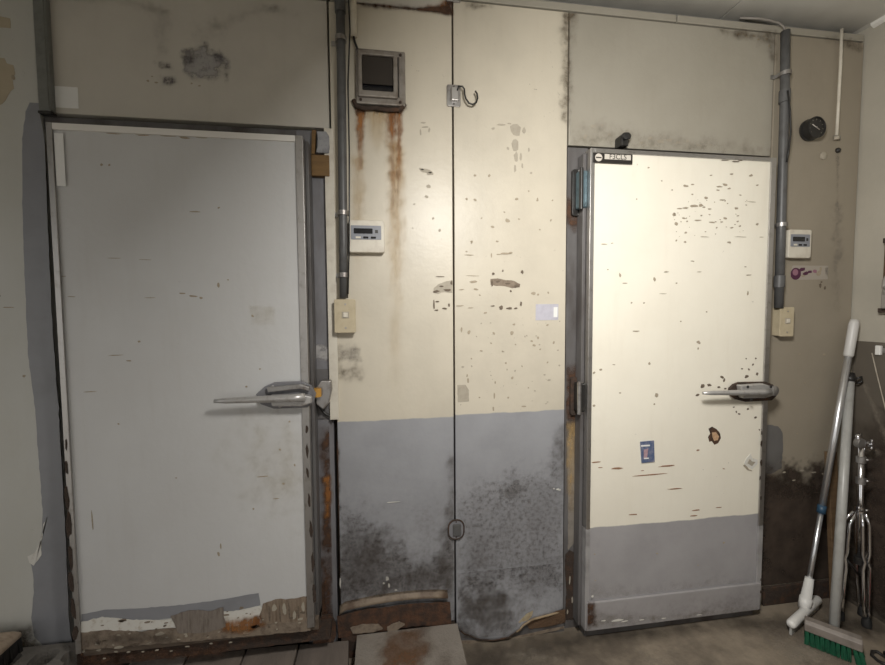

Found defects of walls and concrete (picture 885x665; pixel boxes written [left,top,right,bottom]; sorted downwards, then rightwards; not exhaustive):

mould [184,45,228,86]
corrosion [362,1,452,15]
corrosion [352,99,406,160]
corrosion [64,486,79,641]
corrosion [309,432,451,644]
corrosion [565,368,576,620]
corrosion [708,427,721,445]
leakage [761,462,829,586]
leakage [851,425,885,610]